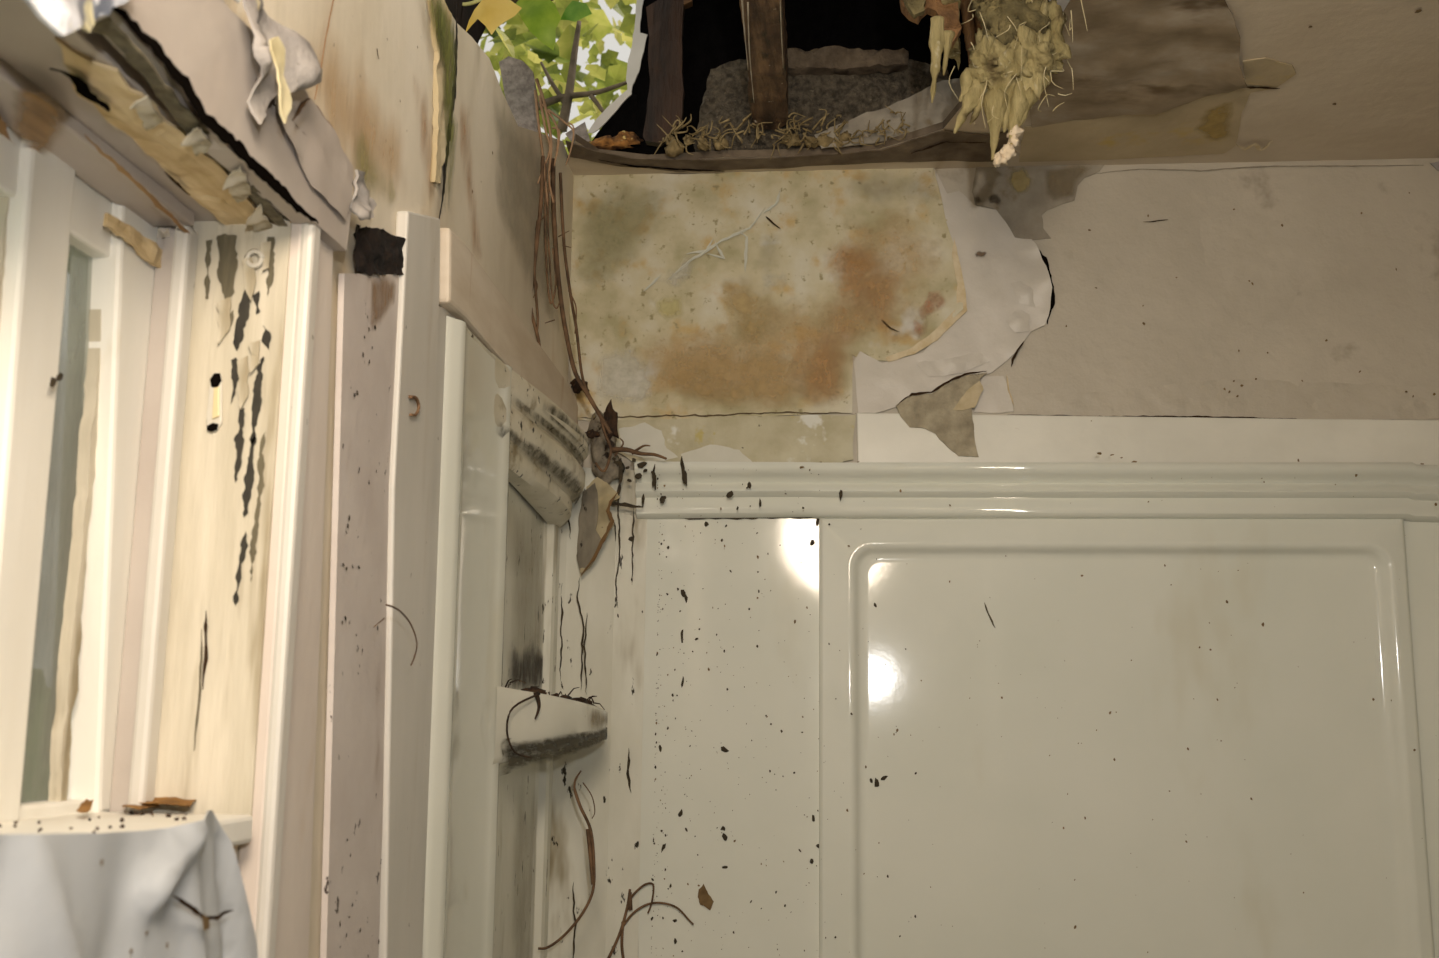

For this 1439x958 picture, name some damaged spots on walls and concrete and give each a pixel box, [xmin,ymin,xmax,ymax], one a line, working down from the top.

crack [112,7,319,223]
peeling [234,0,322,124]
crack [314,0,334,100]
leakage [566,57,1296,172]
crack [84,134,190,234]
spalling [349,170,406,276]
peeling [24,0,288,605]
flaking render [569,165,1104,463]
peeling [194,613,208,750]